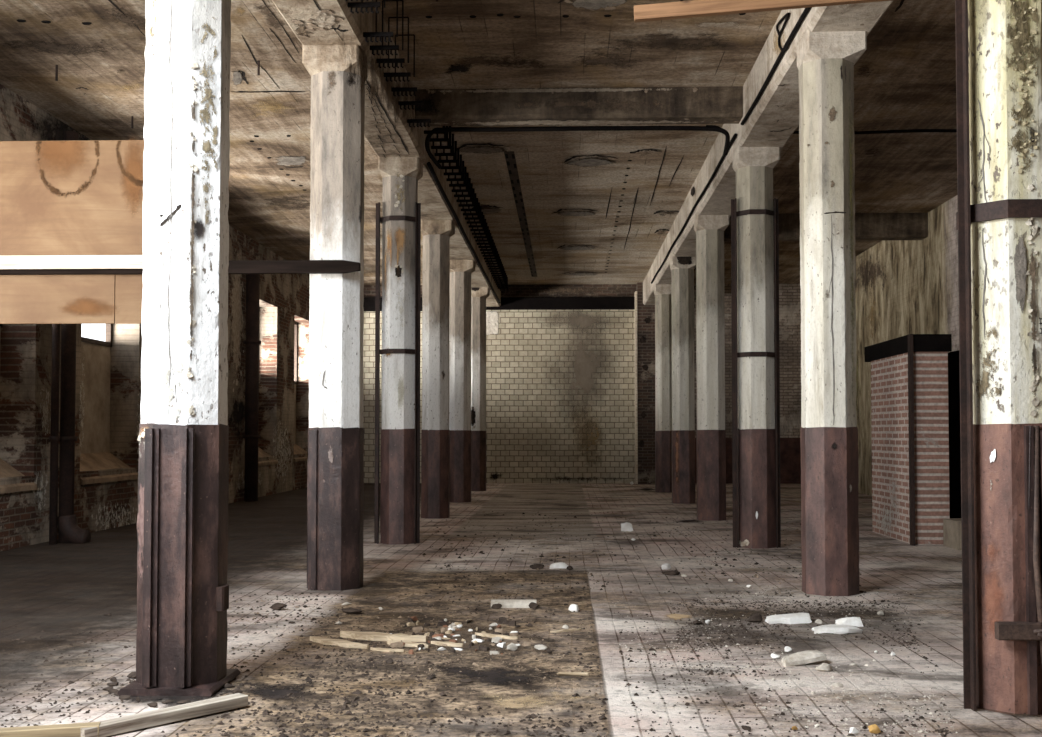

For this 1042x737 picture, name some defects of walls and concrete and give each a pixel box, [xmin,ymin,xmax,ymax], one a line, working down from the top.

peeling [1006,0,1039,191]
peeling [159,17,218,378]
water stain [554,313,608,413]
peeling [976,327,1005,408]
spalling [1014,218,1040,417]